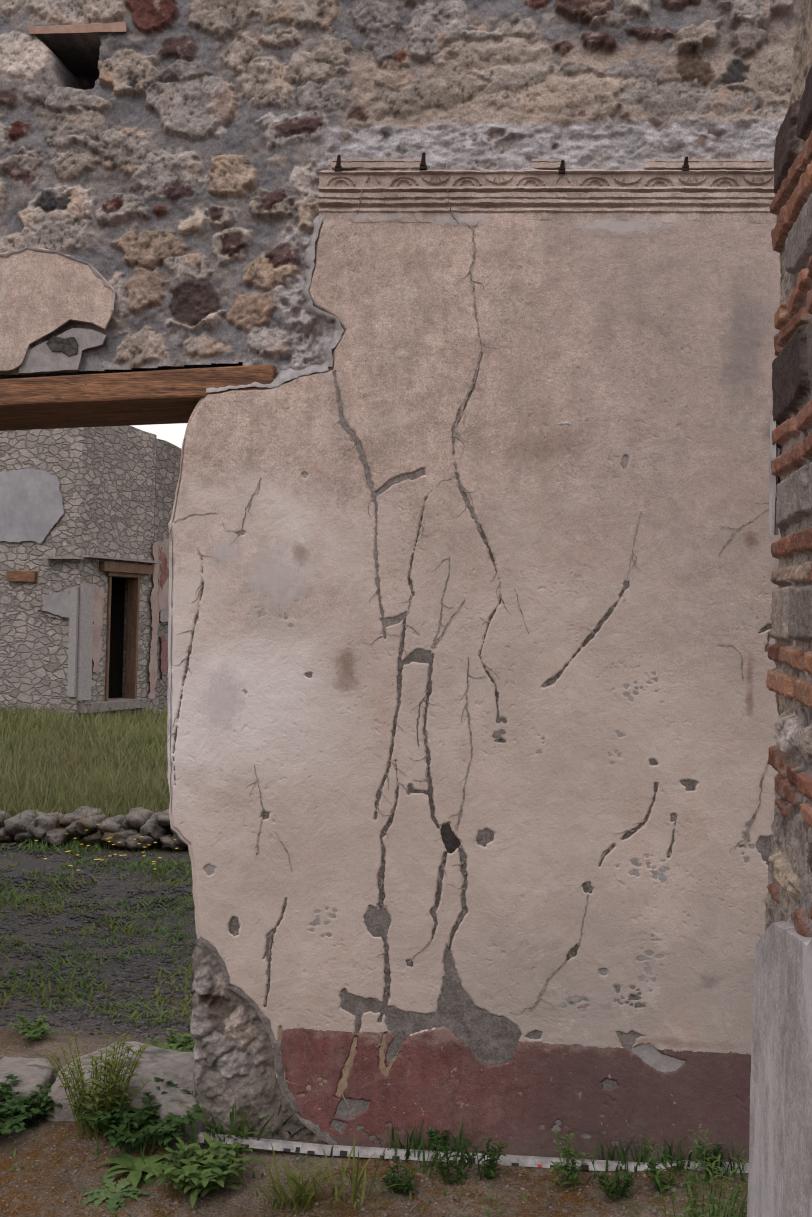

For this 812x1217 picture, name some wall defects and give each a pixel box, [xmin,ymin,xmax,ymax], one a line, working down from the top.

flaking render [46,335,78,356]
crack [162,478,261,785]
crack [333,163,529,1109]
crack [543,511,642,688]
crack [247,765,292,871]
crack [599,784,676,867]
spalling [739,822,772,865]
crack [263,899,299,1086]
spalling [340,945,542,1067]
crack [510,894,589,1015]
spalling [617,1031,685,1073]